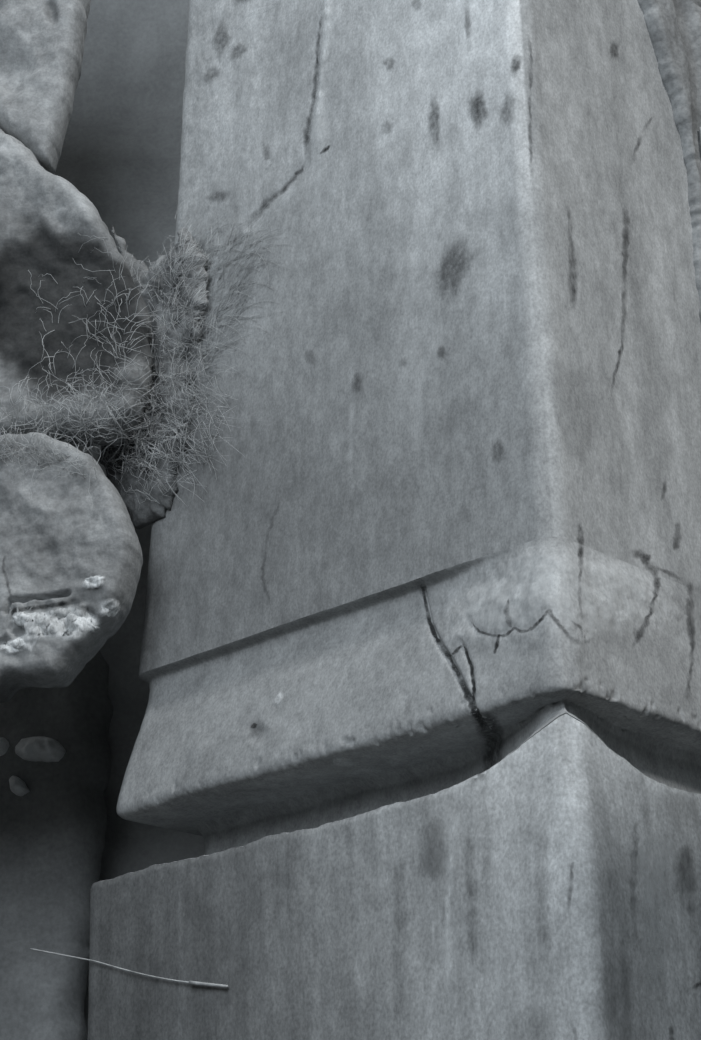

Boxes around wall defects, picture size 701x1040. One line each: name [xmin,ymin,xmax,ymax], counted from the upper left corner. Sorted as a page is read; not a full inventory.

crack [422,540,582,725]
crack [637,554,659,638]